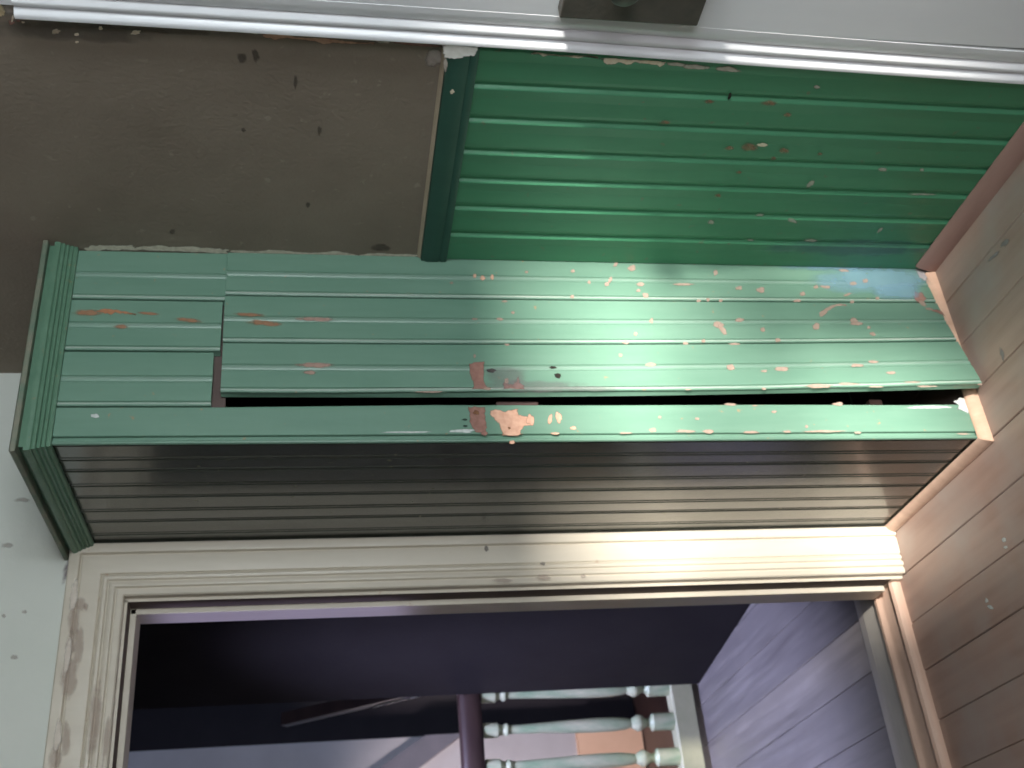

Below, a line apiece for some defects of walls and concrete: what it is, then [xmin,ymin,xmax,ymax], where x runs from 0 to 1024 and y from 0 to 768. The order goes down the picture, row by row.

peeling [531,52,738,72]
peeling [77,309,157,328]
peeling [238,313,278,326]
peeling [713,318,744,345]
peeling [469,354,490,390]
peeling [468,406,534,444]